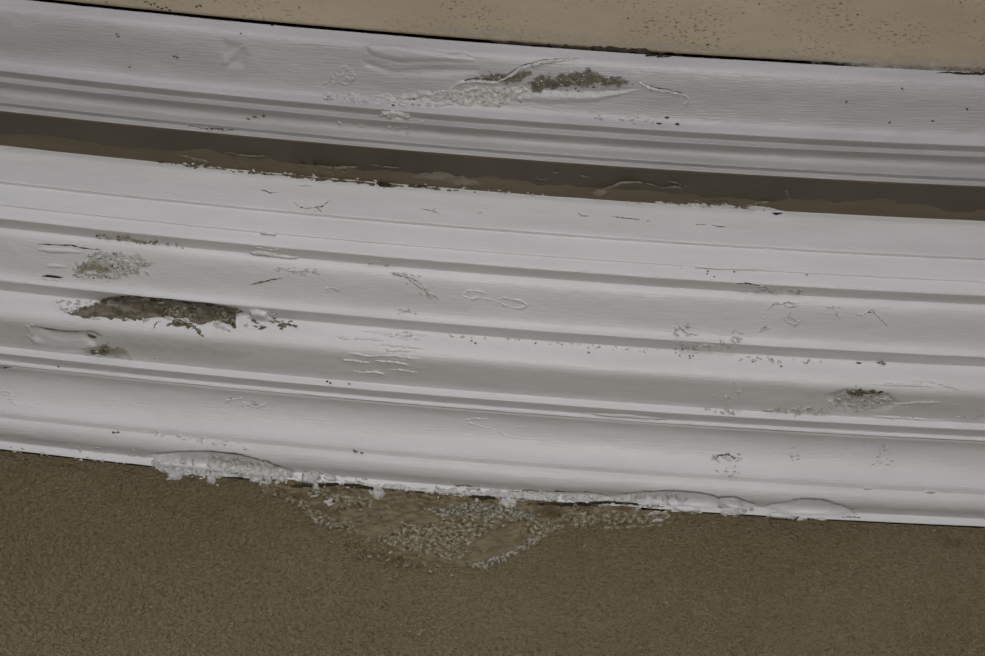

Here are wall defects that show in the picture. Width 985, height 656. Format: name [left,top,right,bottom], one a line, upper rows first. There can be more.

peeling [318,57,639,108]
crack [391,272,529,309]
flaking render [52,295,298,337]
crack [758,301,801,333]
crack [826,306,888,326]
peeling [762,405,838,417]
flaking render [151,430,687,576]